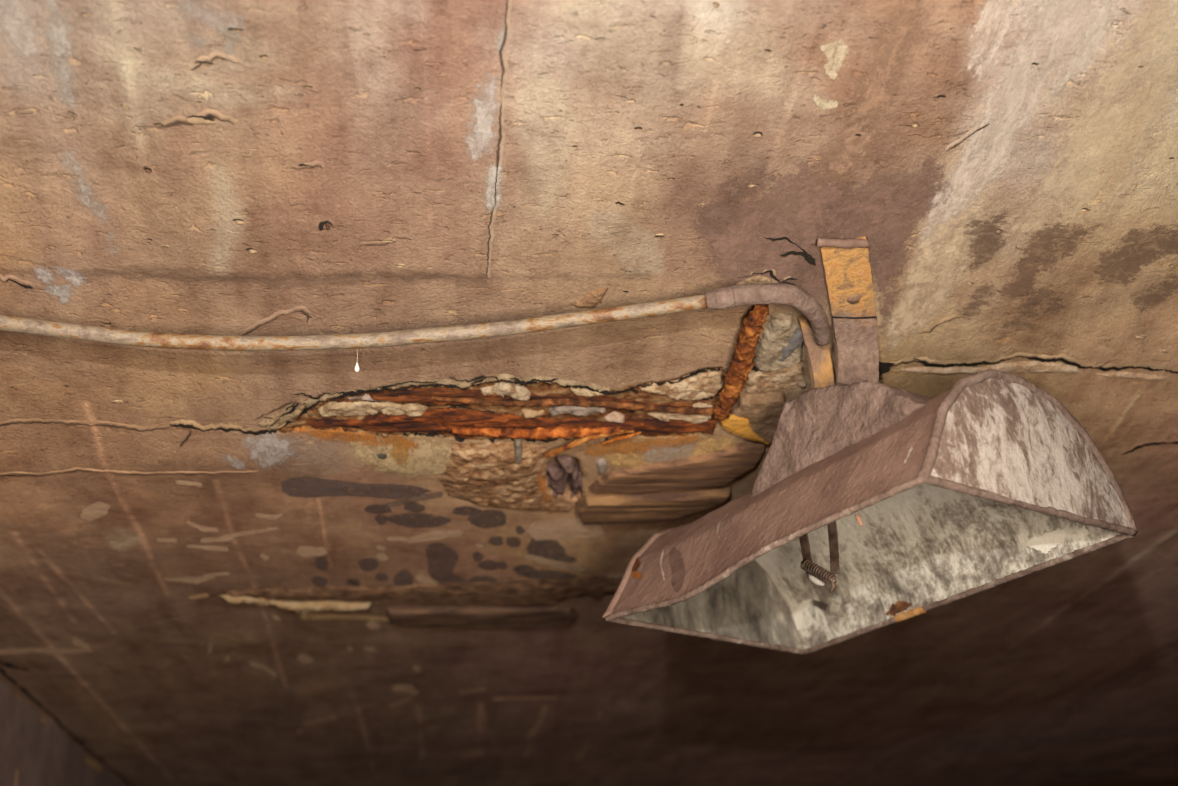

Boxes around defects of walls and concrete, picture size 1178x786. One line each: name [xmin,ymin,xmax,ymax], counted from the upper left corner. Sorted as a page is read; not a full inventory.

crack [487,0,512,278]
water stain [885,0,1114,351]
corrosion [431,304,770,421]
crack [879,313,1178,380]
crack [0,401,307,476]
water stain [221,432,296,469]
corrosion [293,425,418,468]
spalling [257,366,727,541]
corrosion [452,426,698,457]
peeling [156,513,284,551]
water stain [282,434,577,587]
peeling [163,554,625,630]